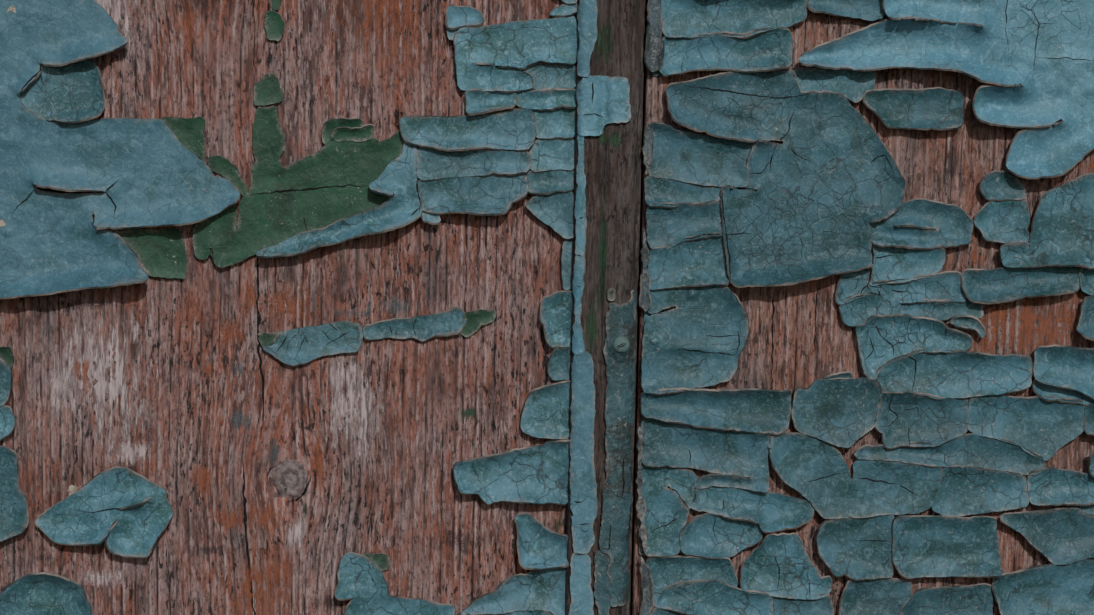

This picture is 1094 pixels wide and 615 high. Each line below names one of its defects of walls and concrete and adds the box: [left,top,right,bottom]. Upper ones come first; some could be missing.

peeling [0,0,637,615]
peeling [636,0,1094,615]
crack [995,0,1092,81]